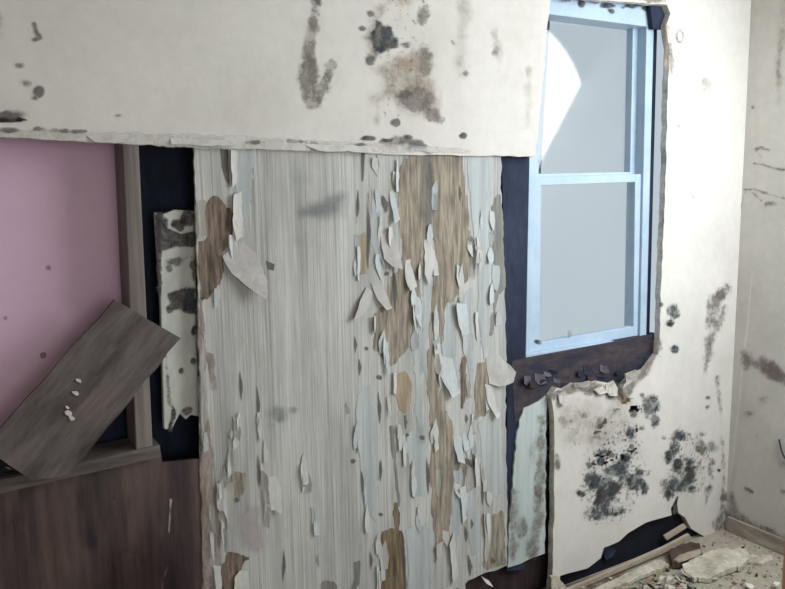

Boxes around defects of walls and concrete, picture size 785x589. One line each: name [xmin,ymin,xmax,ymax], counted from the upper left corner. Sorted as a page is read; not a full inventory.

water stain [309,0,320,31]
water stain [360,11,409,65]
water stain [24,82,44,100]
water stain [299,41,336,107]
water stain [385,48,441,122]
peeling [0,111,516,589]
flaking render [551,356,654,406]
water stain [705,284,730,370]
water stain [743,353,785,380]
water stain [577,395,660,524]
water stain [662,430,724,501]
water stain [715,493,772,533]